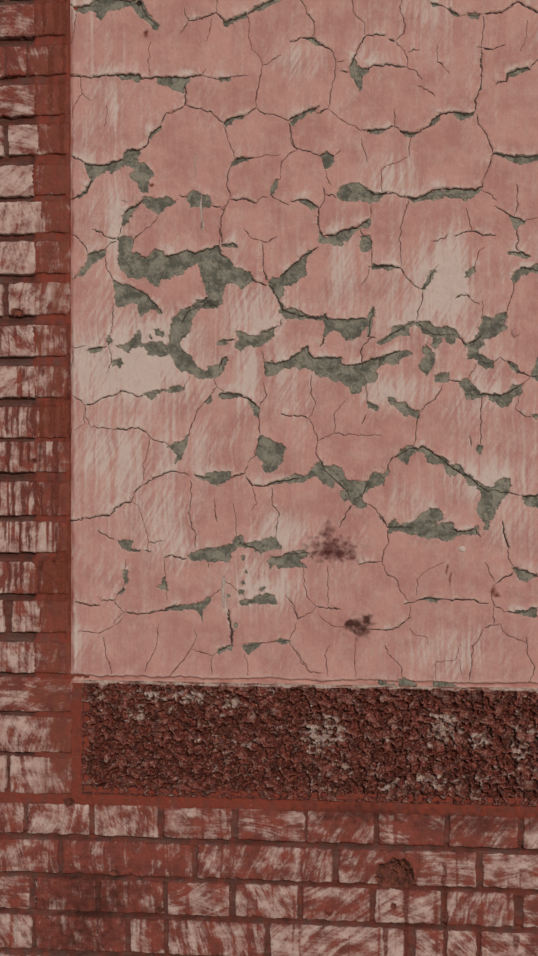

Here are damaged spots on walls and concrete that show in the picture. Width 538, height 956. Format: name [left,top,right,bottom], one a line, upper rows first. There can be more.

peeling [66,0,160,45]
peeling [342,0,422,91]
crack [69,0,538,281]
crack [380,185,535,321]
crack [71,345,190,430]
crack [217,376,382,462]
peeling [70,139,538,622]
crack [70,471,188,552]
crack [502,521,515,568]
crack [76,599,124,674]
crack [169,530,535,683]